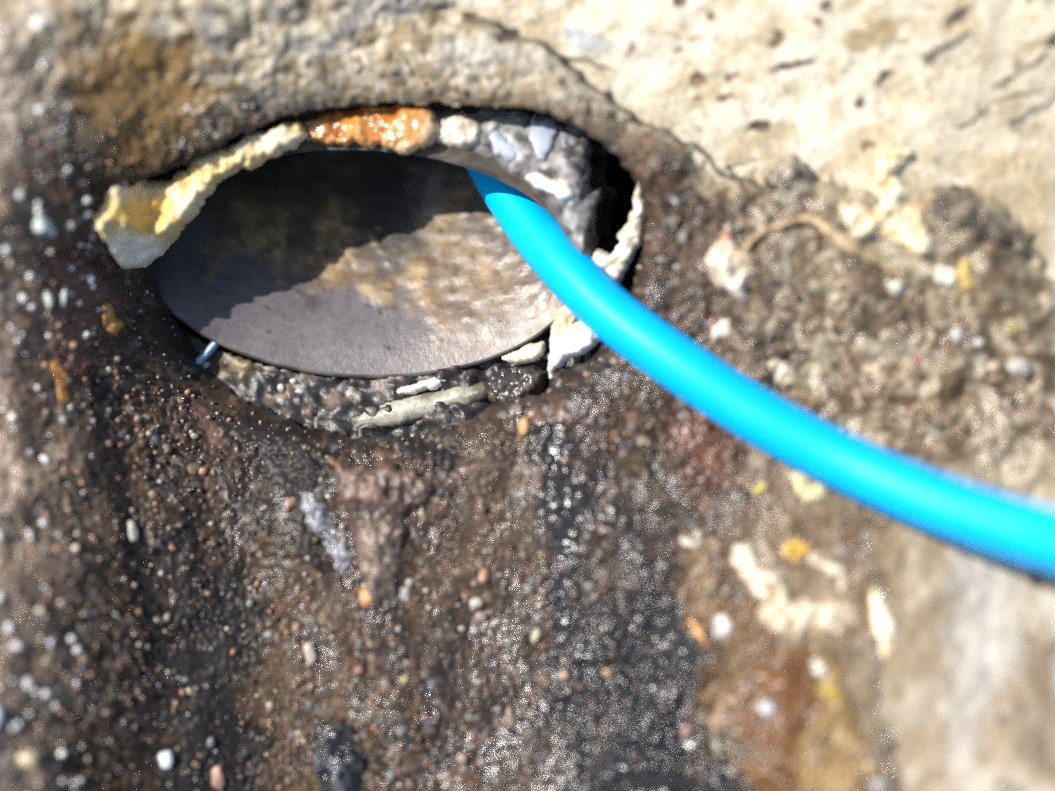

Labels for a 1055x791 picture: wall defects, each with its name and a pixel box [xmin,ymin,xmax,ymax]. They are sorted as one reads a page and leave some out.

rust [304,102,441,155]
peeling [489,130,517,163]
peeling [529,114,571,160]
crack [462,12,773,244]
water stain [218,415,332,575]
water stain [398,439,462,470]
water stain [89,374,272,791]
water stain [527,423,707,791]